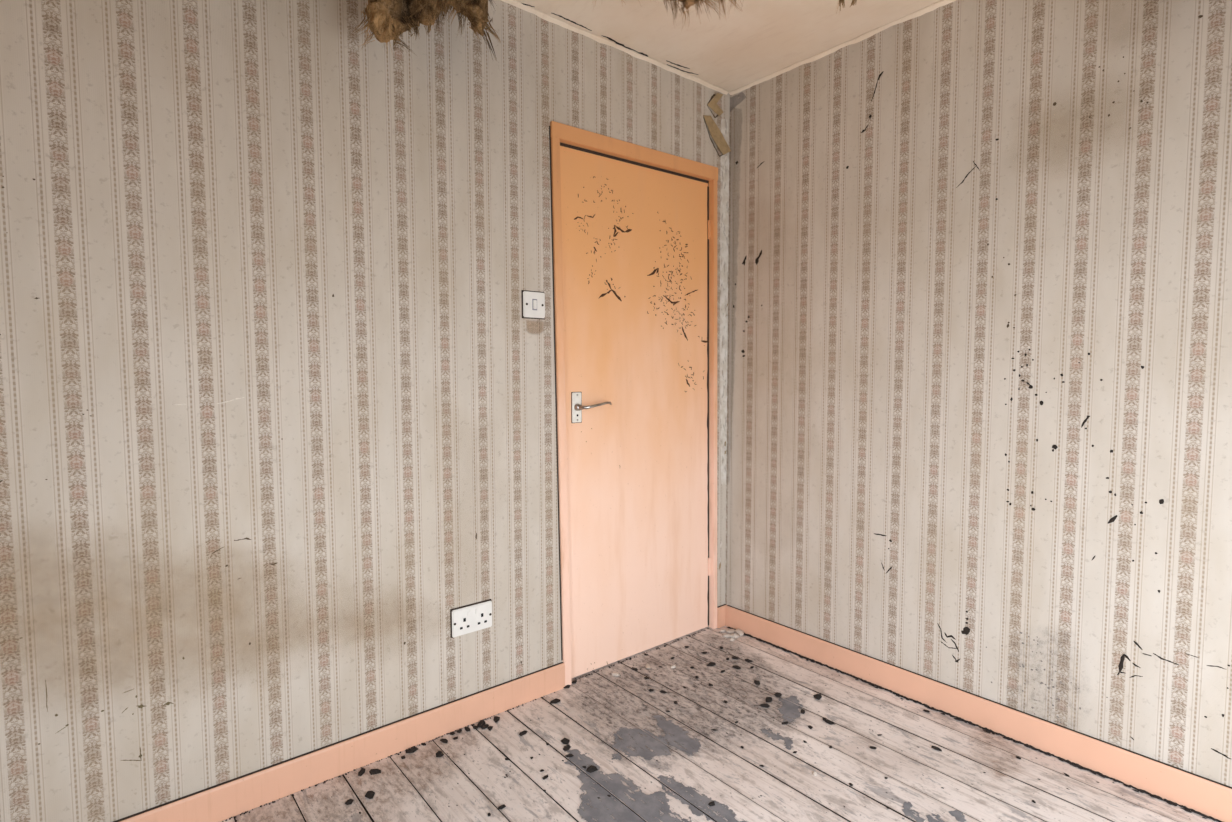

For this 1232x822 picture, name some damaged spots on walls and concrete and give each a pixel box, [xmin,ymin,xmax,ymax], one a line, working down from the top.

peeling [761,696,804,750]
peeling [564,715,747,822]
peeling [901,801,966,822]